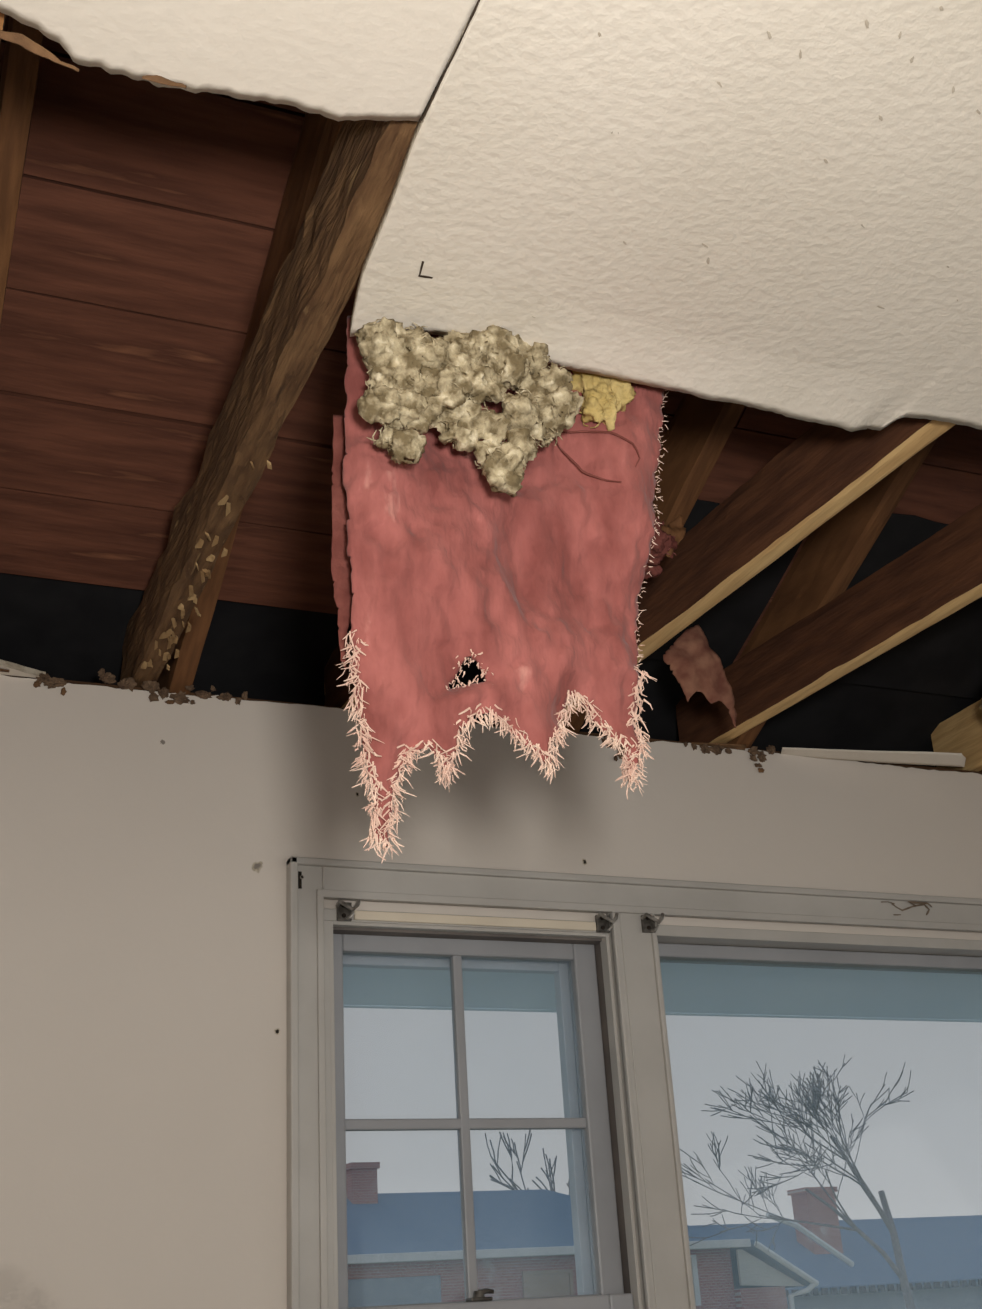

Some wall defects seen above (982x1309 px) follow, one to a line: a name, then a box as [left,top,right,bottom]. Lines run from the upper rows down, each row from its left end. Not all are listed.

crack [420,0,485,121]
peeling [218,495,231,516]
spalling [98,532,248,705]
spalling [33,673,67,696]